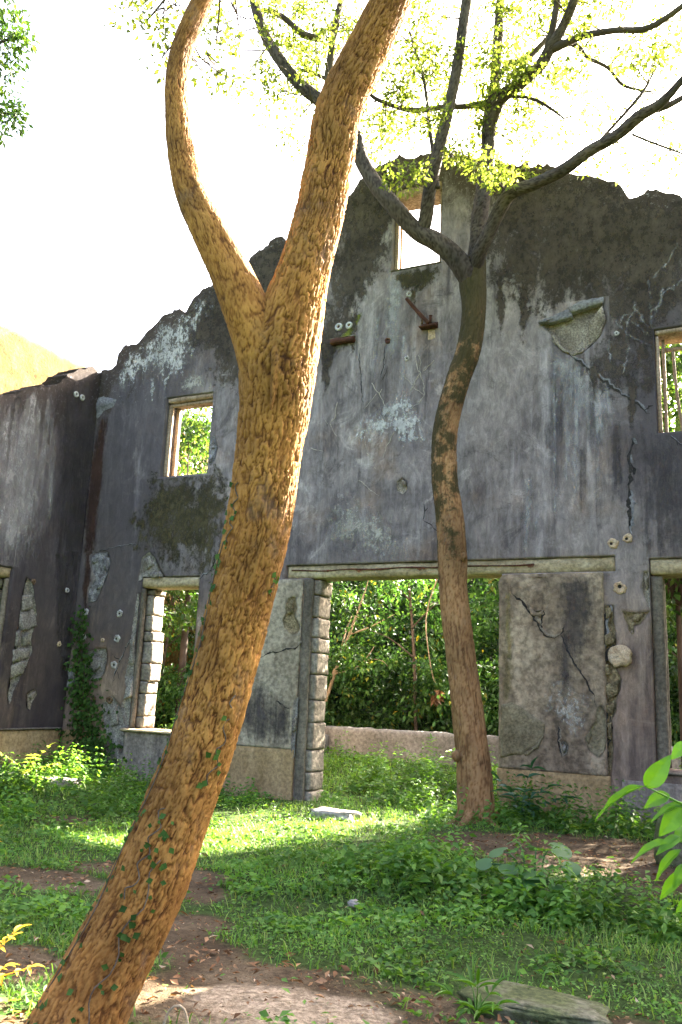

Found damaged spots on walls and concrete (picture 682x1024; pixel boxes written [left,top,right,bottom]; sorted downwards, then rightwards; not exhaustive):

water stain [250,243,285,292]
water stain [120,288,239,396]
water stain [486,167,682,484]
efflorescence [356,396,424,441]
crack [626,438,638,534]
peeling [88,552,110,602]
spalling [7,578,38,704]
spalling [27,690,37,710]
crack [513,594,613,759]